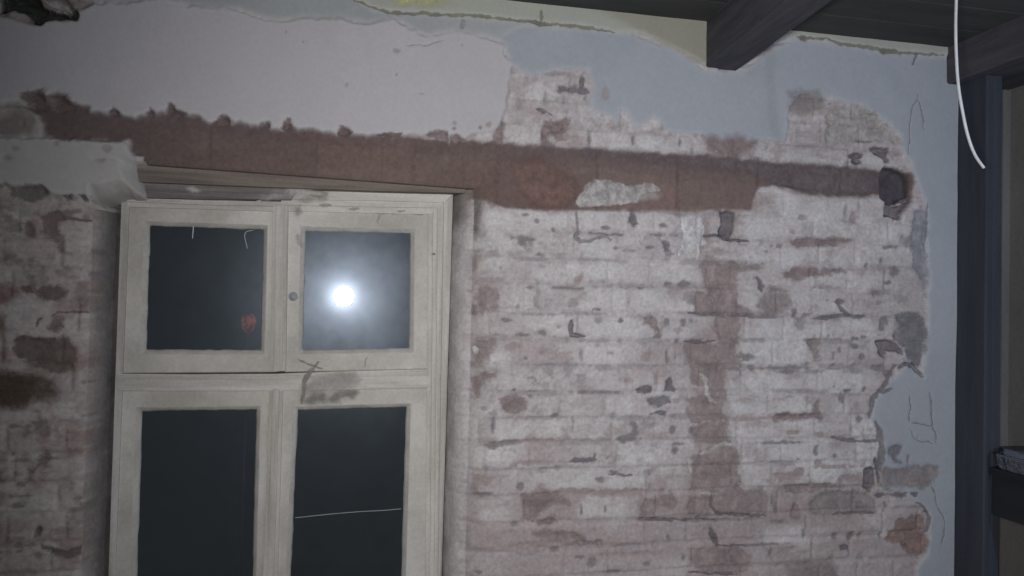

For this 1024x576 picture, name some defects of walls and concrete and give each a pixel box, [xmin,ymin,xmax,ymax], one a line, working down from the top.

flaking render [3,0,79,26]
spalling [537,108,569,146]
spalling [848,148,909,220]
spalling [703,211,749,242]
flaking render [791,238,852,247]
flaking render [784,267,830,280]
flaking render [12,286,90,373]
spalling [875,340,903,358]
flaking render [636,262,768,575]
flaking render [772,401,822,421]
crack [831,362,937,470]
flaking render [785,445,938,518]